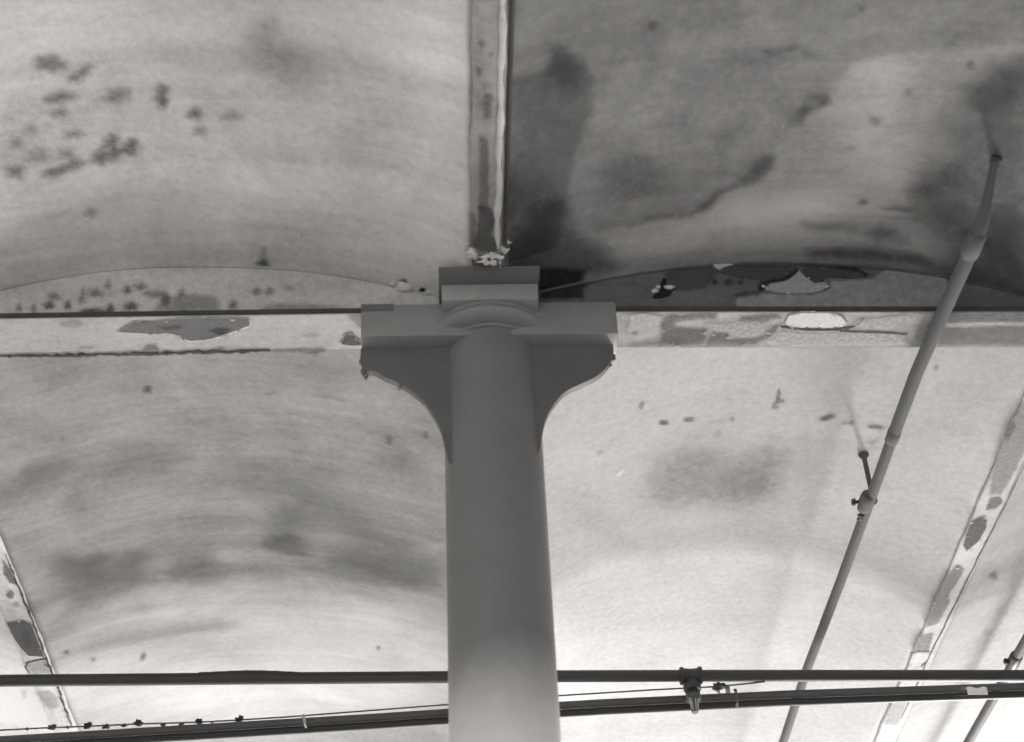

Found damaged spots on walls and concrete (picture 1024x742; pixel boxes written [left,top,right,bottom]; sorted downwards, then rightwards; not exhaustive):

peeling [466,206,512,266]
peeling [118,317,251,352]
peeling [634,265,948,347]
peeling [964,407,1024,551]
peeling [3,561,16,598]
peeling [5,619,45,657]
peeling [913,566,963,653]